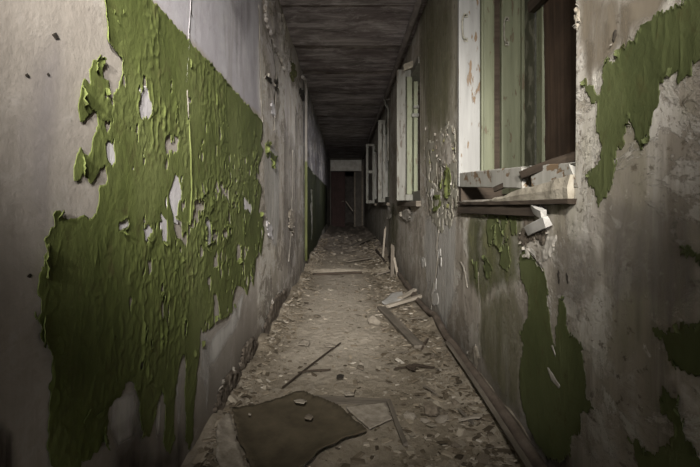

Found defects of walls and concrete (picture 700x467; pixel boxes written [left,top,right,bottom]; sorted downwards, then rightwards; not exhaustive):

peeling [580,0,700,207]
peeling [27,0,278,467]
peeling [423,121,458,234]
flaking render [263,288,288,334]
peeling [471,214,594,463]
peeling [652,320,700,377]
peeling [627,386,700,467]